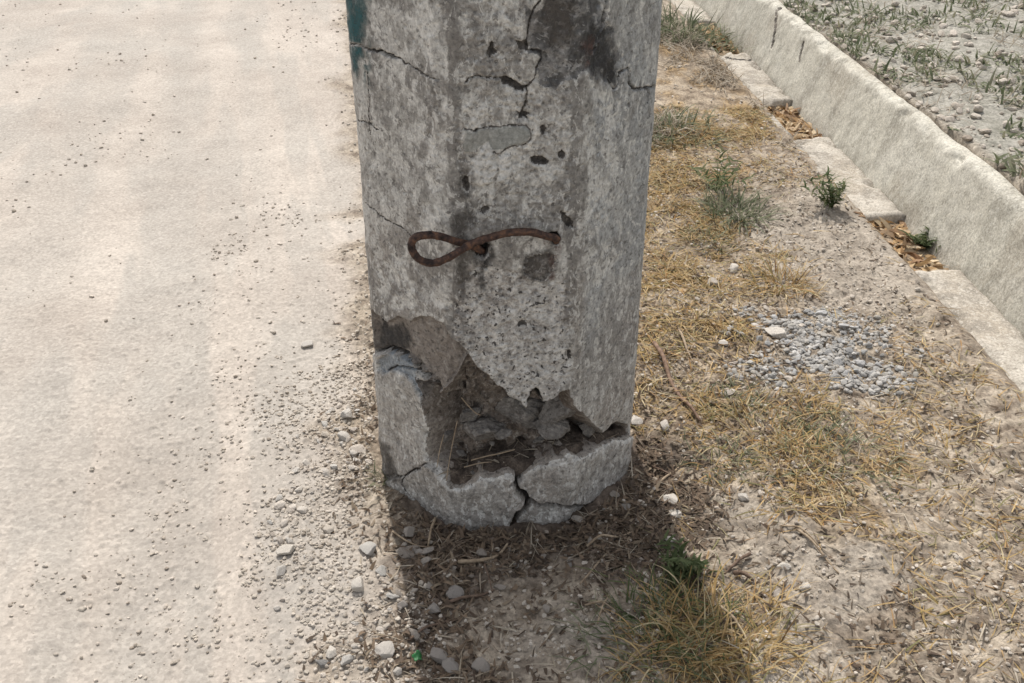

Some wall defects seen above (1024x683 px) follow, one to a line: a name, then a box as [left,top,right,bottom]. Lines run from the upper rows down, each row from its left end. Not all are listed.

crack [725,7,782,61]
crack [350,43,435,135]
crack [464,0,542,154]
crack [607,67,654,103]
crack [365,202,411,236]
spalling [371,243,632,490]
crack [401,463,427,497]
crack [513,475,560,515]